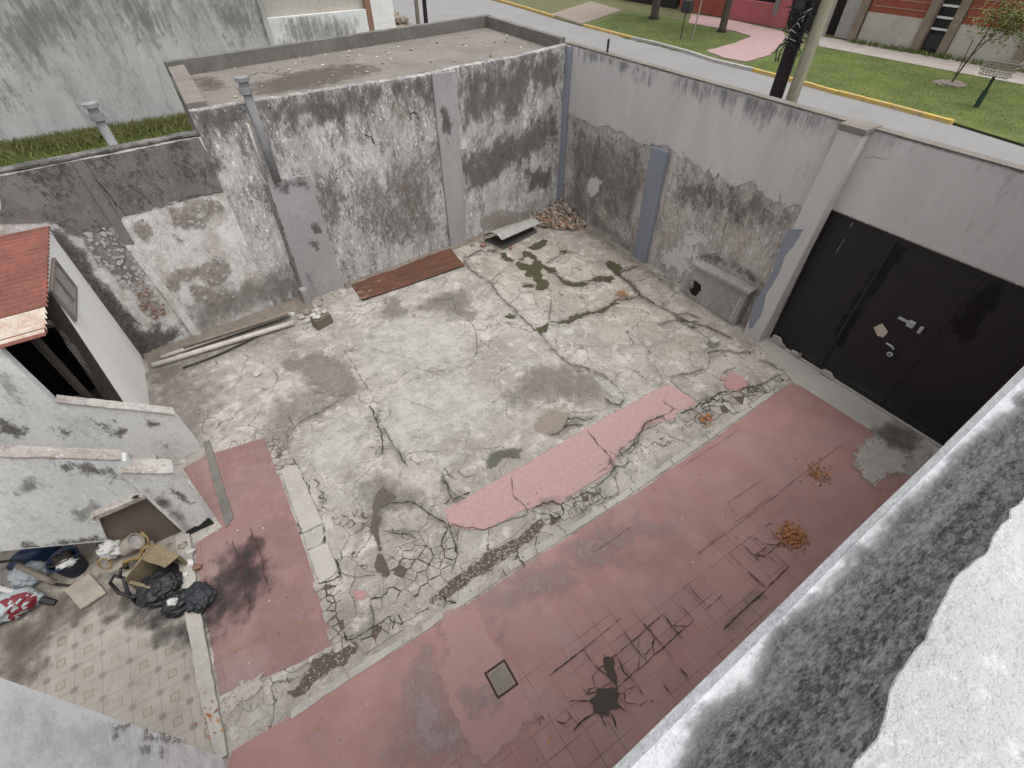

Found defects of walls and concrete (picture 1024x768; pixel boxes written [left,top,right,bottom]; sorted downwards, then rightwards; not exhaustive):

leakage [197,107,243,170]
leakage [257,51,564,191]
peeling [130,219,153,242]
peeling [79,227,234,320]
peeling [168,199,226,244]
leakage [276,141,445,251]
peeling [655,216,713,282]
crack [288,250,786,574]
crack [215,529,268,617]
crack [293,458,395,641]
spalling [541,485,603,525]
crack [536,448,838,731]